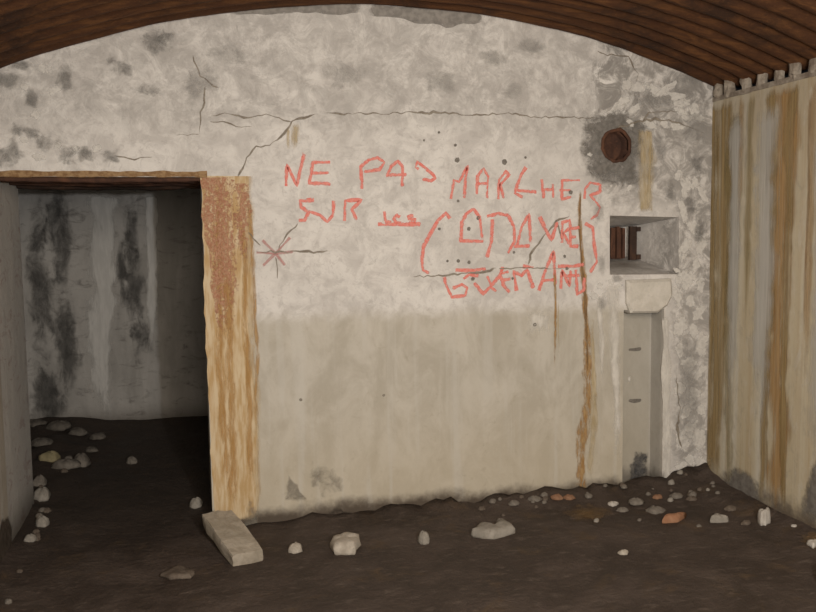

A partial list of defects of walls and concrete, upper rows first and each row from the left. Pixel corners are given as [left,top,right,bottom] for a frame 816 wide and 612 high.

crack [179,57,593,176]
damp [582,113,644,184]
crack [618,111,703,133]
damp [35,374,63,417]
damp [27,196,77,379]
damp [87,196,158,410]
corrosion [0,170,259,519]
crack [249,225,325,278]
crack [414,217,568,278]
corrosion [576,195,598,487]
corrosion [707,106,732,463]
corrosion [761,87,799,497]